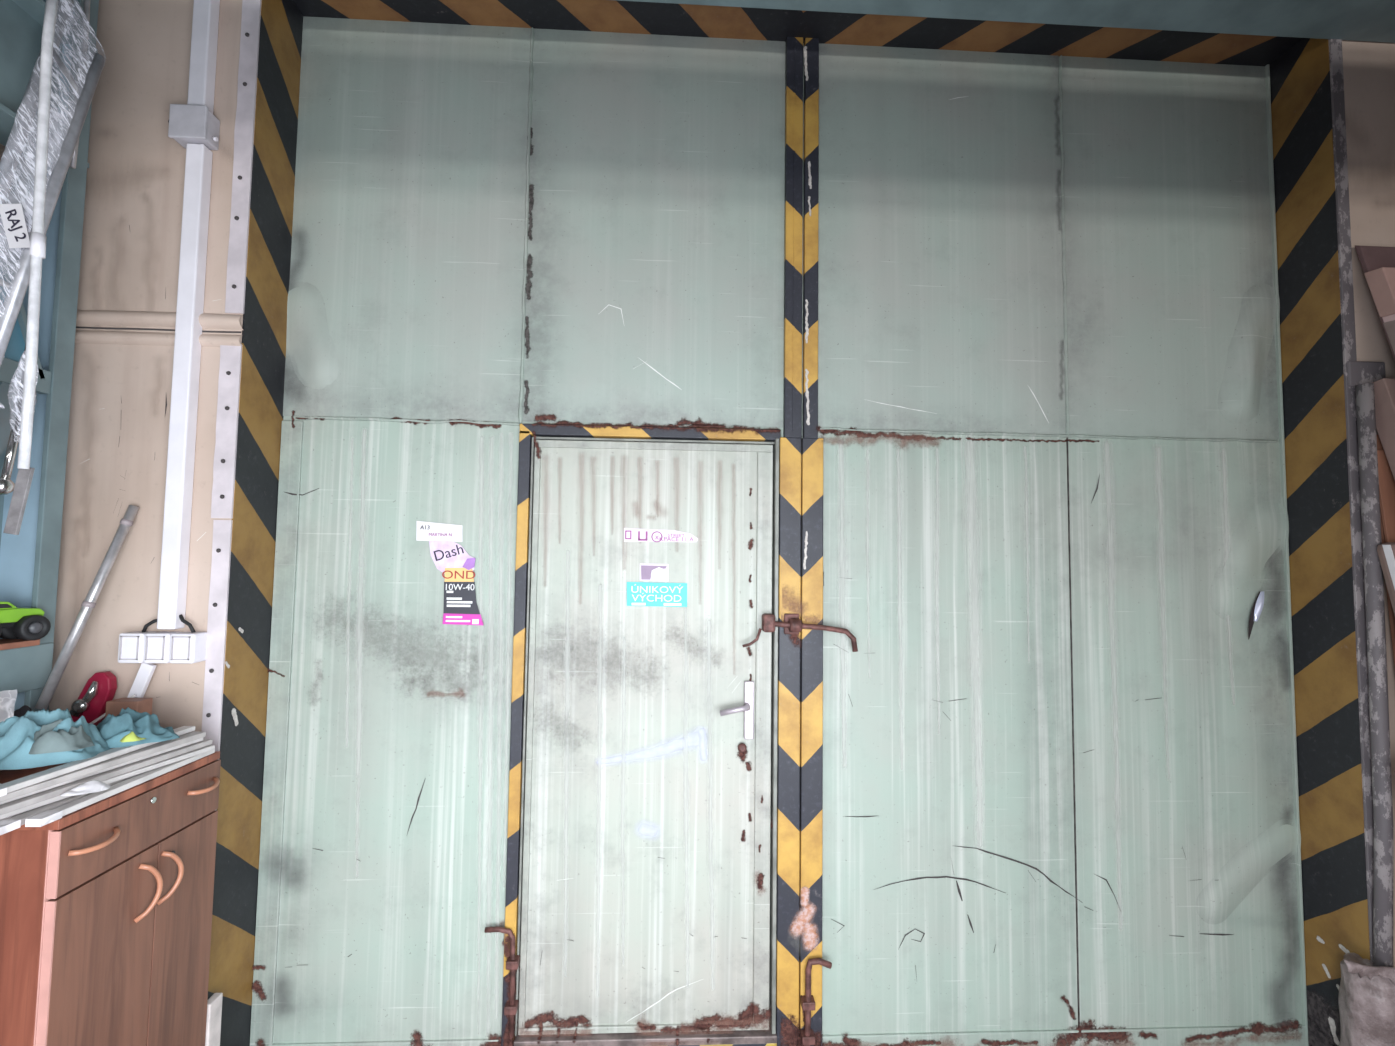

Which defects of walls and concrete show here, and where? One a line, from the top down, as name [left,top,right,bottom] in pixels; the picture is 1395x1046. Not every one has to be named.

corrosion [532,414,781,459]
corrosion [816,426,1099,446]
corrosion [480,936,590,1046]
corrosion [411,1031,430,1046]
corrosion [637,1003,948,1046]
corrosion [981,996,1157,1046]
corrosion [1185,1020,1301,1046]